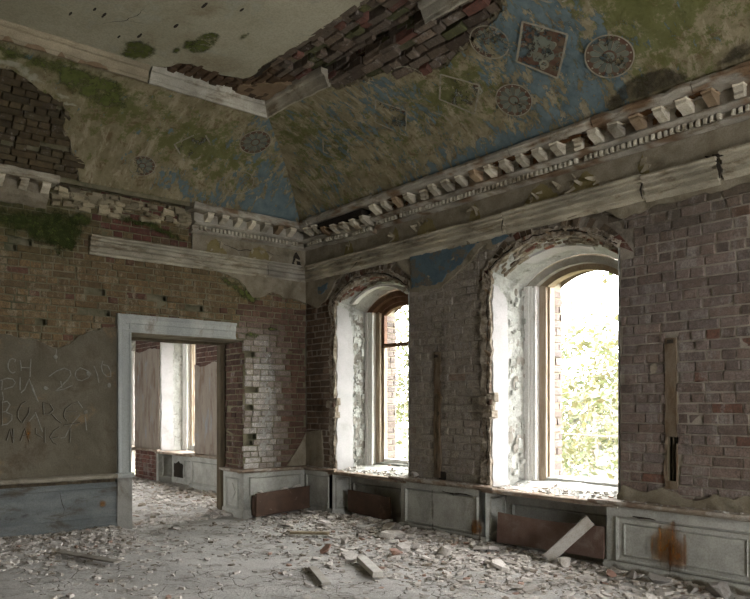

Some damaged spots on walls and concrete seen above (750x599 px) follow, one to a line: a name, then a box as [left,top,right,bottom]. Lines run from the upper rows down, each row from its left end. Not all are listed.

spalling [157,0,505,101]
spalling [0,67,85,180]
crack [705,154,724,178]
spalling [318,225,622,469]
spalling [479,405,493,487]
rust [651,521,686,568]